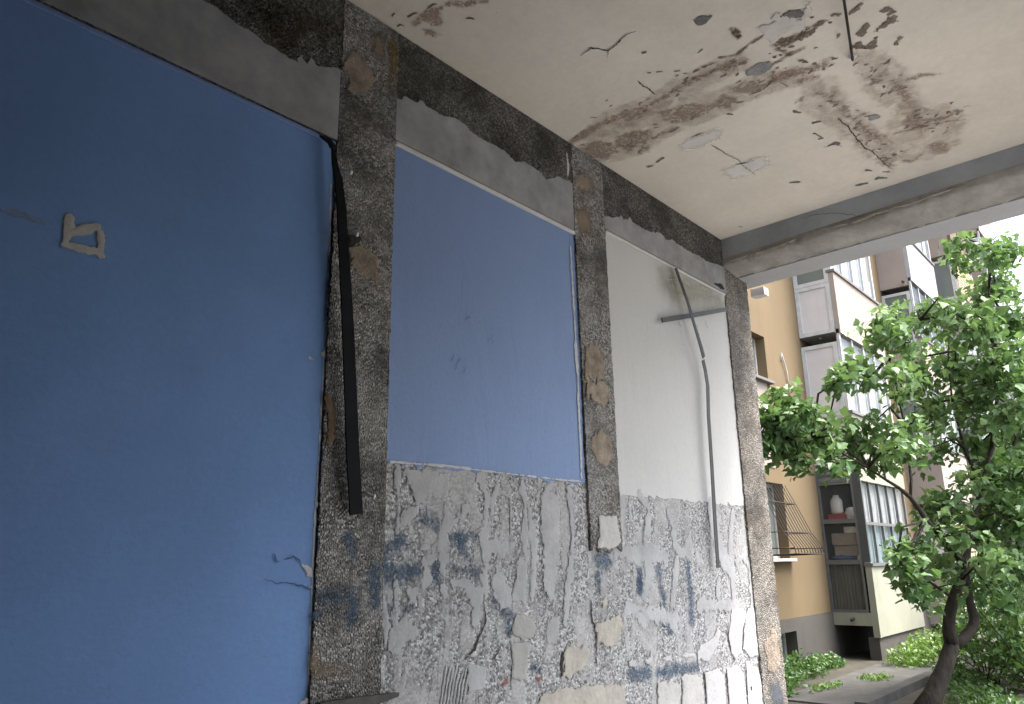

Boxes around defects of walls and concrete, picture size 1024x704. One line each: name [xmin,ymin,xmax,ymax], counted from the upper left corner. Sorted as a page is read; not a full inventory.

crack [580,31,635,57]
flaking render [759,2,812,43]
flaking render [852,6,899,50]
water stain [570,16,838,159]
water stain [816,59,966,166]
crack [838,117,893,169]
peeling [61,213,106,259]
spalling [390,246,612,482]
crack [265,554,311,590]
flaking render [629,651,696,667]